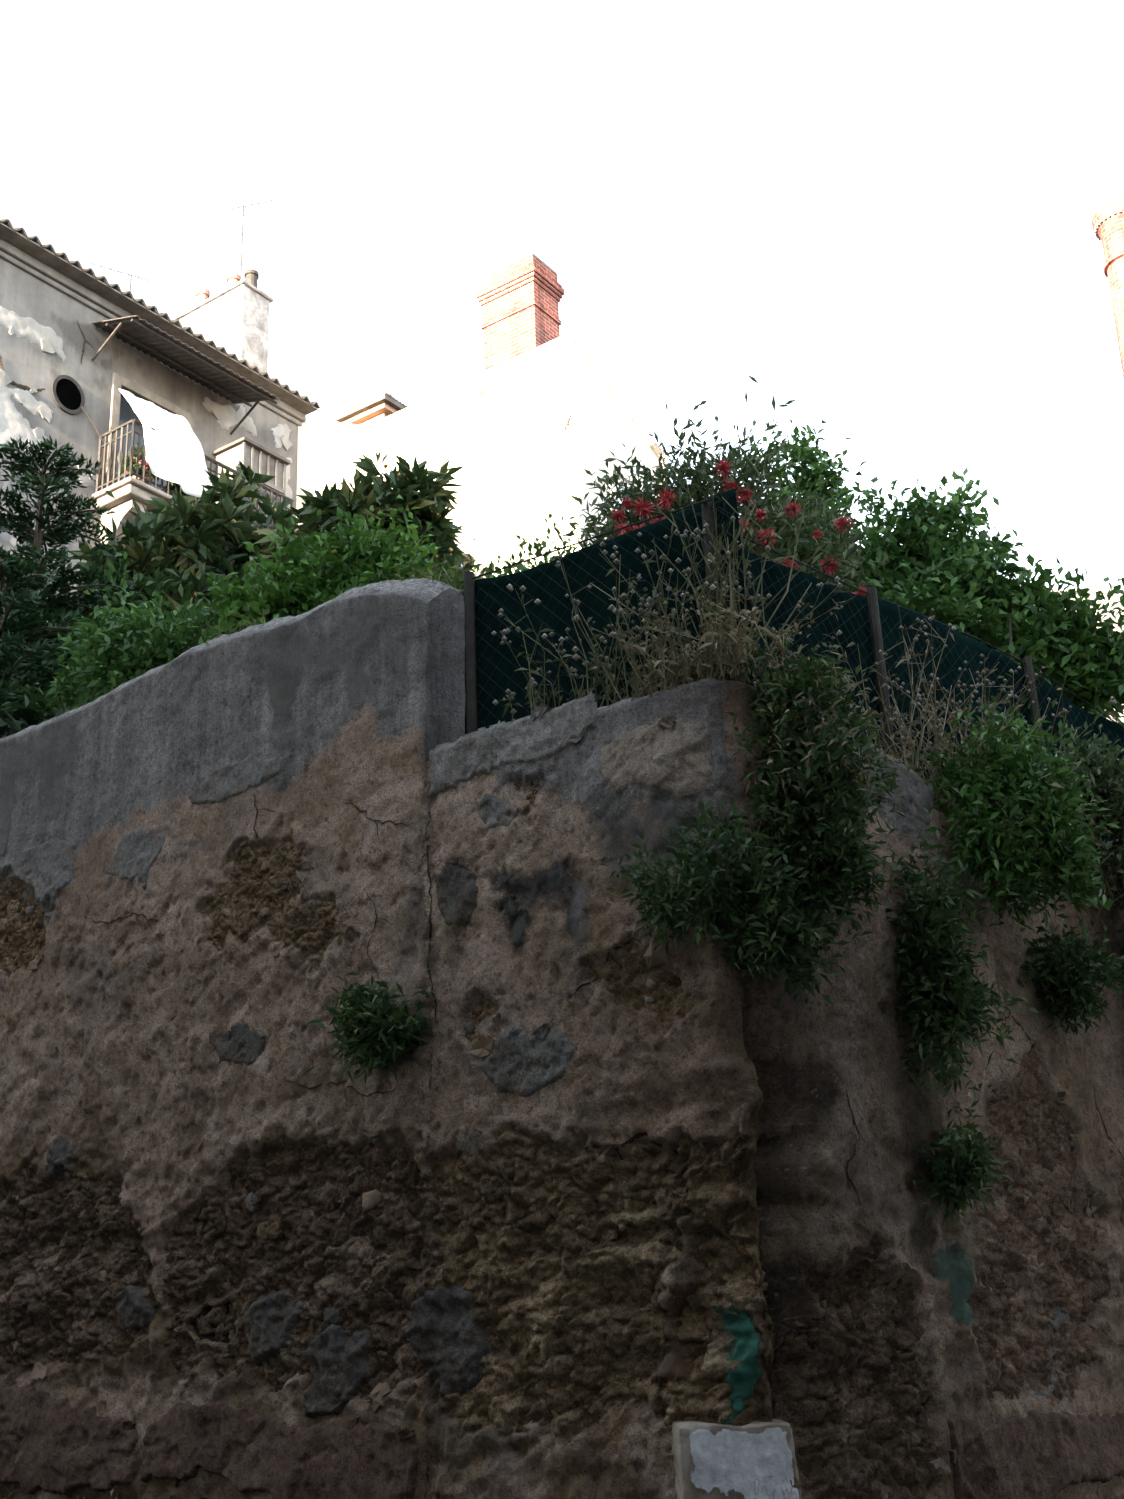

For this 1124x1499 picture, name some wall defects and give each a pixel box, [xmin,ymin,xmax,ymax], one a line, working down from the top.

flaking render [0,306,67,361]
flaking render [0,355,53,454]
flaking render [201,397,293,510]
flaking render [0,872,54,979]
flaking render [201,840,351,964]
flaking render [0,1042,1124,1499]